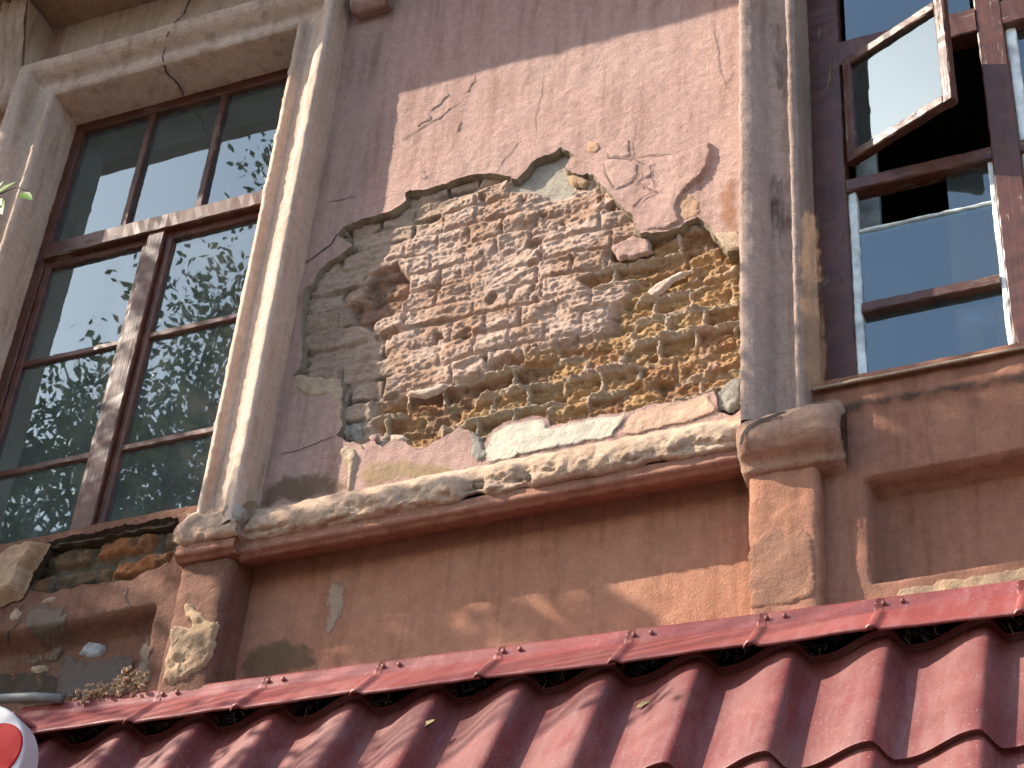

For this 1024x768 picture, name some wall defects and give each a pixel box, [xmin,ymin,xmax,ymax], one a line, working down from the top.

crack [162,0,190,97]
peeling [404,76,477,140]
crack [602,120,672,209]
flaking render [293,147,741,462]
flaking render [0,517,179,705]
flaking render [163,603,220,685]
peeling [325,581,346,637]